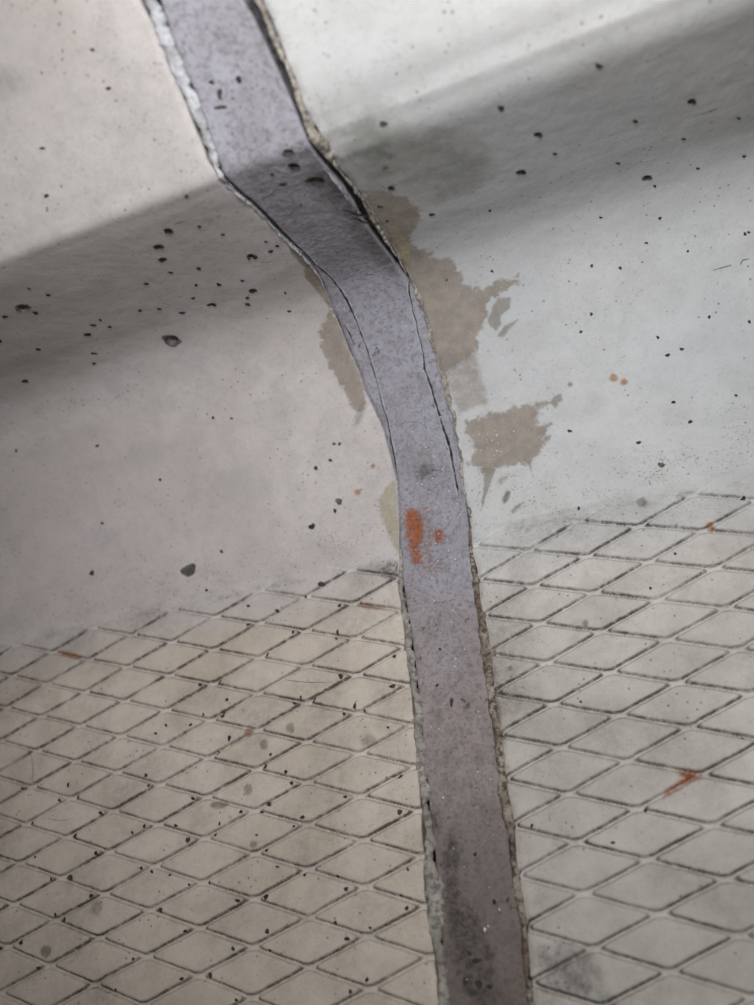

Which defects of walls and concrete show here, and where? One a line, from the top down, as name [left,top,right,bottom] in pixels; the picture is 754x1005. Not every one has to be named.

crack [217,0,459,498]
water stain [364,191,518,373]
water stain [319,311,364,411]
water stain [466,395,560,499]
corrosion [407,510,422,562]